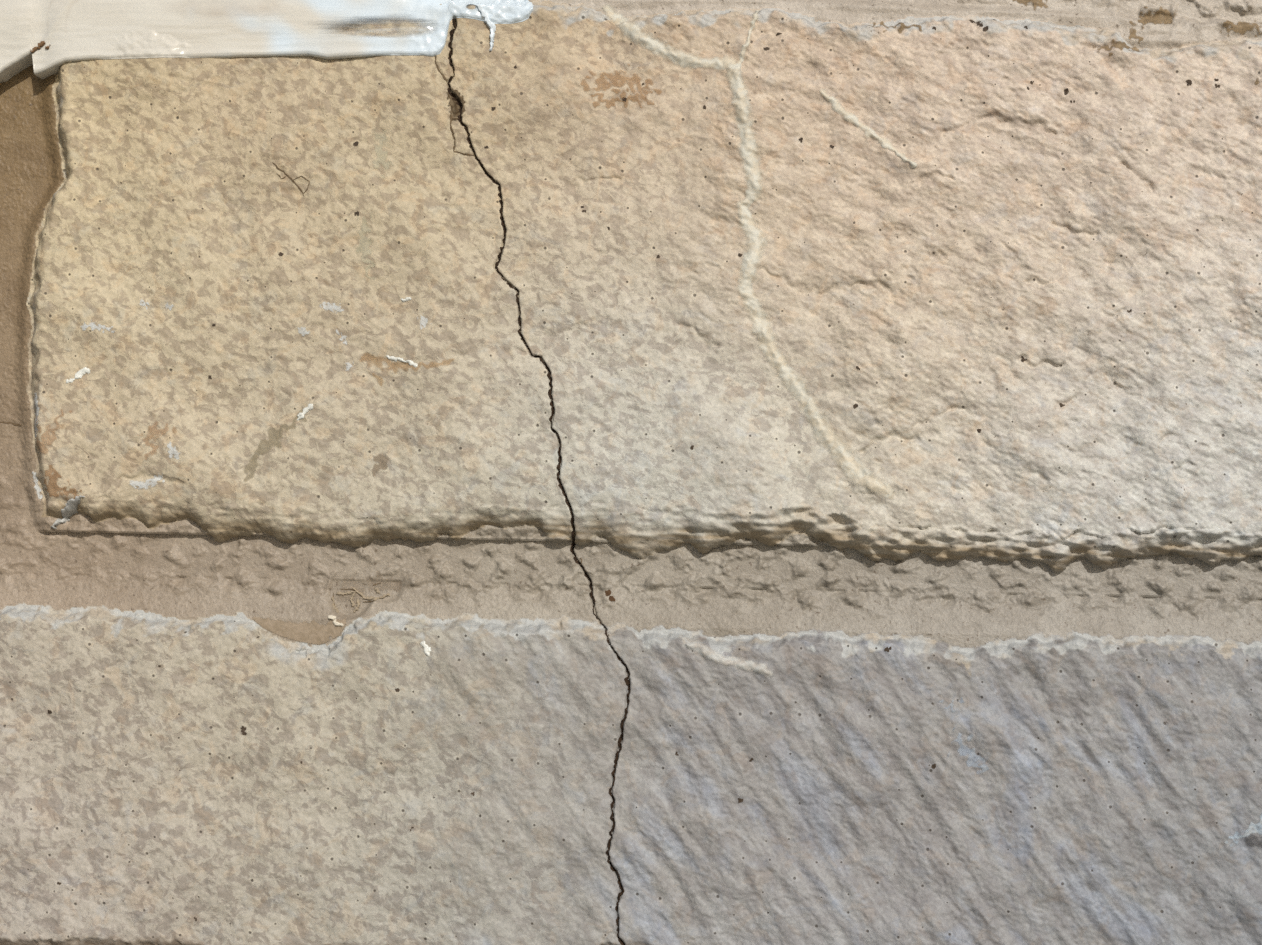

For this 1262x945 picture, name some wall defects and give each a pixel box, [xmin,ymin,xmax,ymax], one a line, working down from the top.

crack [435,18,630,945]